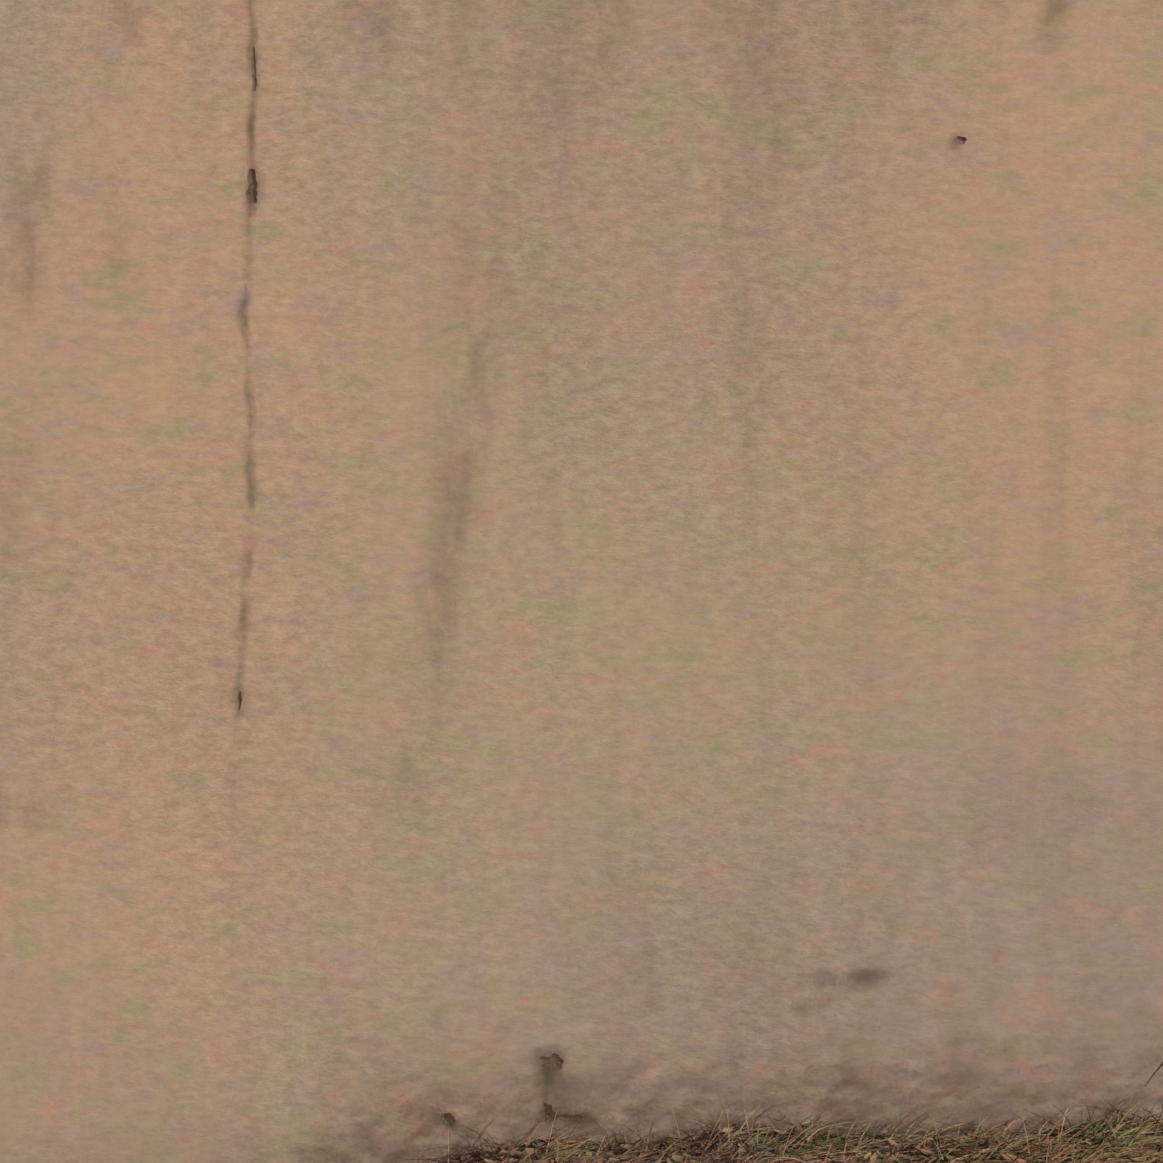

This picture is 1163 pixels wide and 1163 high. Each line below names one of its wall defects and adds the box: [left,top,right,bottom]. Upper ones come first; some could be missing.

crack [250,47,258,92]
crack [246,169,258,203]
crack [235,691,243,710]